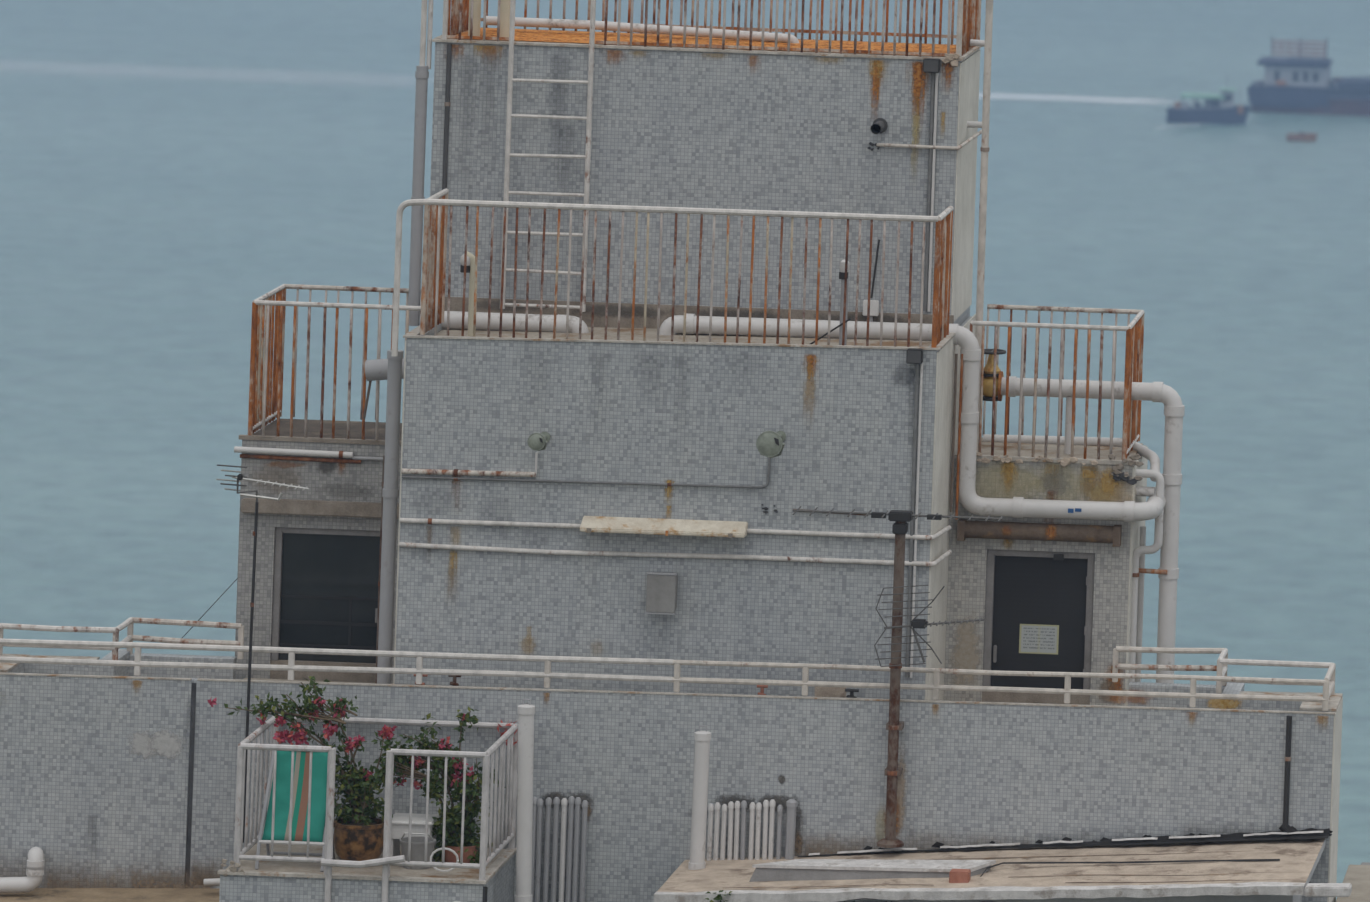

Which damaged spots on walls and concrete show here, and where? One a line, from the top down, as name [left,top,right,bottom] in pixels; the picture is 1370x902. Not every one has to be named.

rust [452,28,956,144]
rust [805,355,816,400]